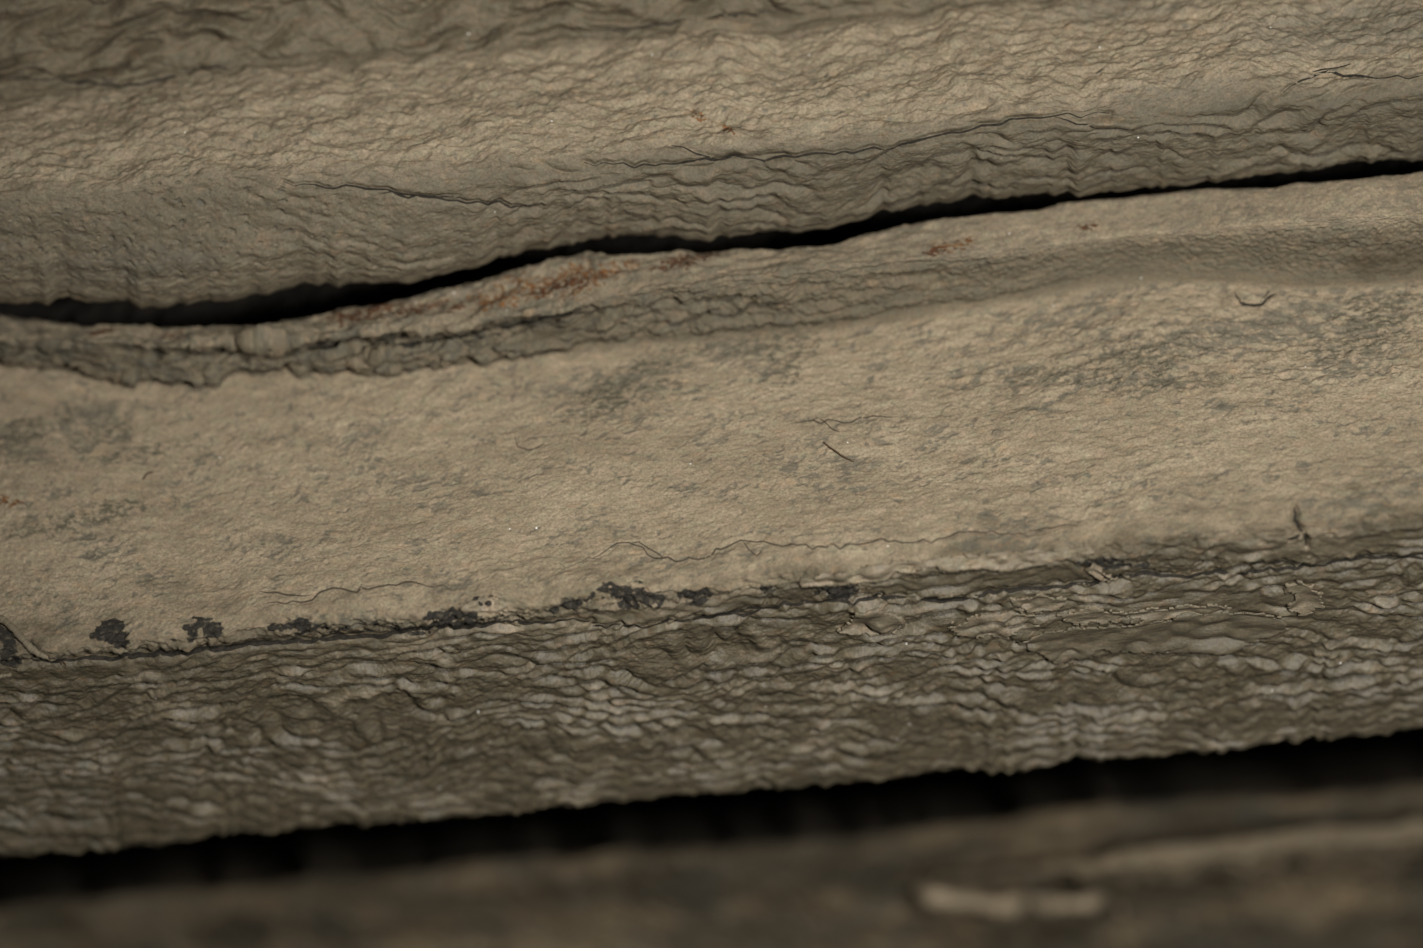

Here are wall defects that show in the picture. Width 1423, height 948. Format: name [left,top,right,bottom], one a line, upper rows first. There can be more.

crack [0,160,1423,352]
rust [321,252,720,329]
peeling [0,615,55,679]
peeling [89,618,130,649]
peeling [173,616,224,643]
peeling [267,617,351,636]
peeling [372,595,510,636]
peeling [549,576,721,614]